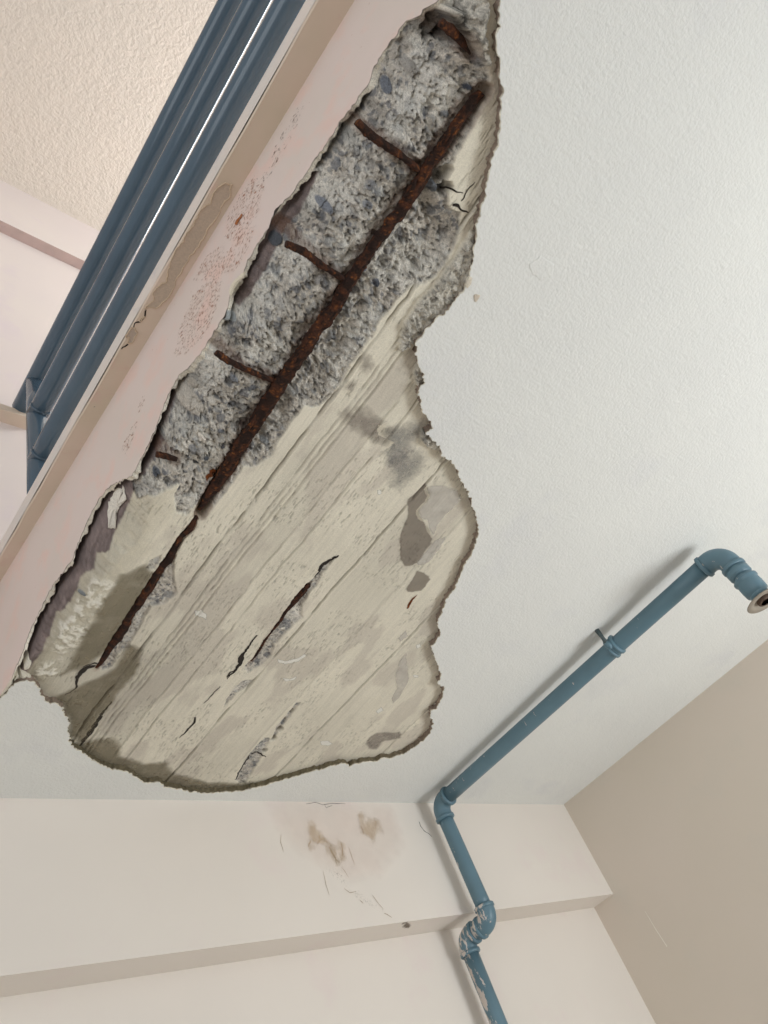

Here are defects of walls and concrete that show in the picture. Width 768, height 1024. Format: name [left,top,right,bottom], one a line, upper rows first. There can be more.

crack [439,182,475,213]
rust [174,180,264,353]
spalling [0,0,504,794]
water stain [351,416,418,482]
crack [314,555,339,577]
water stain [400,483,461,592]